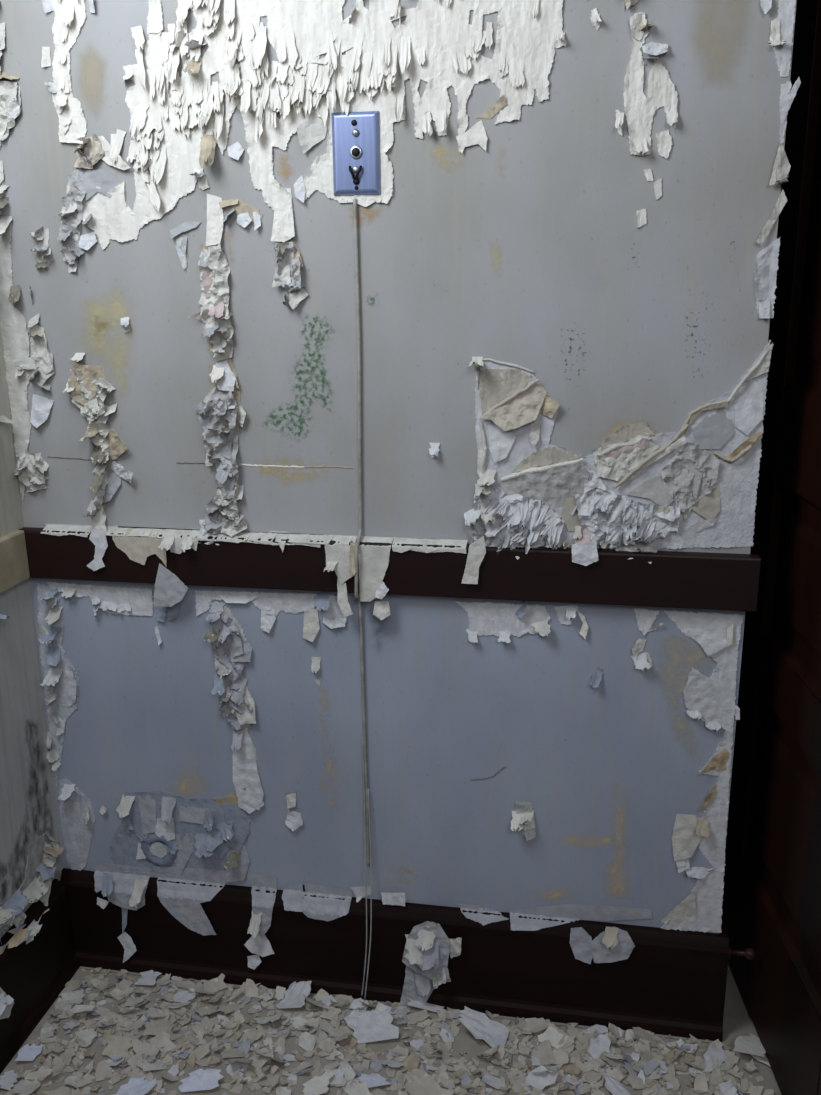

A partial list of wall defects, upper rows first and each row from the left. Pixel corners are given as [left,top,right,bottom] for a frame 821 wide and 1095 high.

peeling [0,22,55,505]
peeling [41,0,567,310]
peeling [590,8,602,31]
peeling [615,0,678,159]
peeling [643,169,662,200]
peeling [754,0,801,319]
damp [270,318,328,434]
peeling [0,194,774,969]
peeling [0,988,14,1019]
peeling [400,921,462,1005]